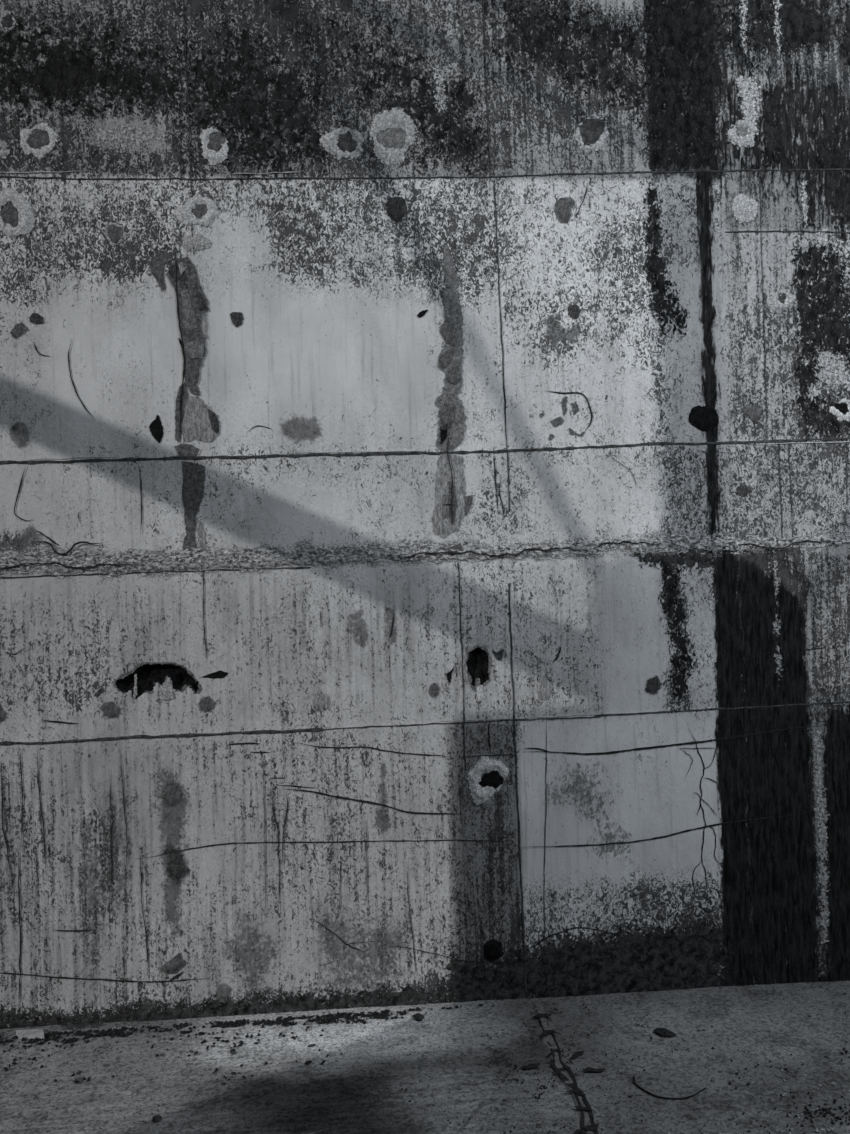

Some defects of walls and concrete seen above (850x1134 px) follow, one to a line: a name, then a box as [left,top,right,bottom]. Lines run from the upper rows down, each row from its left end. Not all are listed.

spalling [0,122,58,160]
spalling [199,126,229,165]
water stain [0,3,504,190]
spalling [319,107,419,167]
water stain [484,0,850,446]
peeling [149,248,220,558]
peeling [432,243,473,538]
spalling [94,662,228,700]
water stain [0,425,850,1029]
spalling [447,645,504,701]
spalling [467,756,510,805]
crack [521,1004,607,1134]